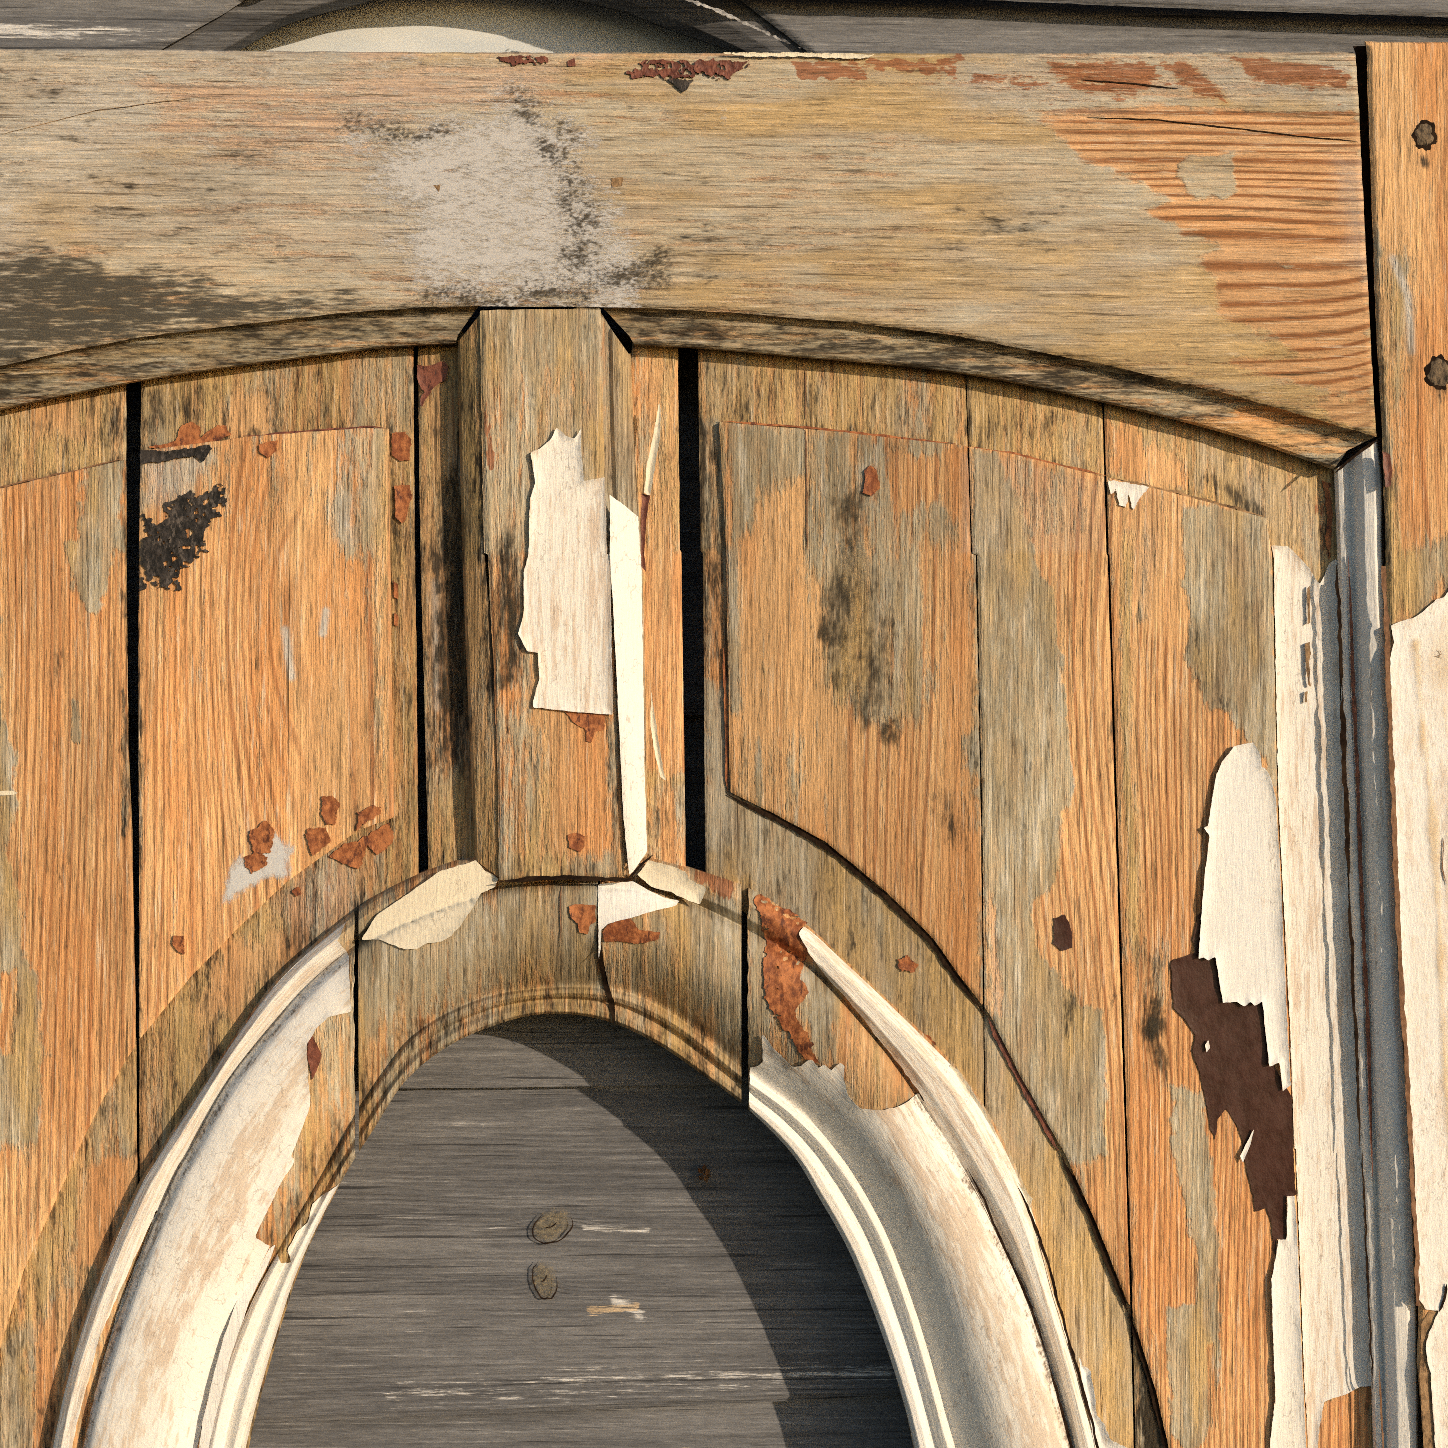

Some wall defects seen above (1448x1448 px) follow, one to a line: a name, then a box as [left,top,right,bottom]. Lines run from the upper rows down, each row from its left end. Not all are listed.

peeling [53,922,351,1448]
peeling [362,860,498,949]
peeling [518,404,706,953]
peeling [722,648,1168,1448]
peeling [1171,480,1371,1448]
peeling [1390,592,1448,1448]